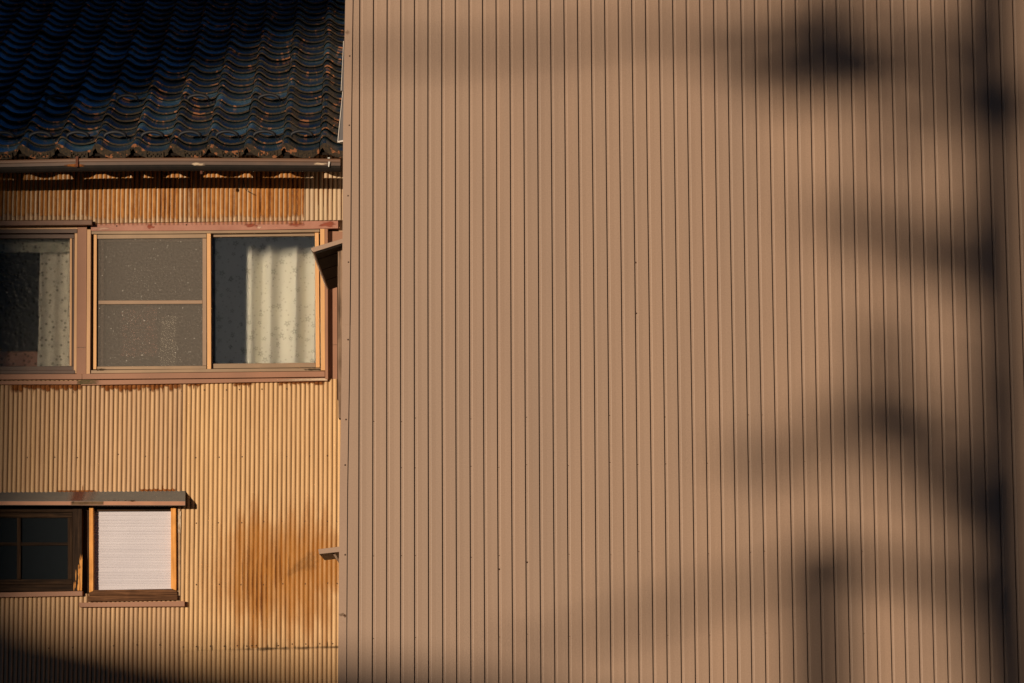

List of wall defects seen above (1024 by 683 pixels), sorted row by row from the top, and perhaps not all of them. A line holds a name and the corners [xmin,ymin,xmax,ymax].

rust [0,164,304,229]
rust [318,172,342,218]
rust [220,512,337,648]